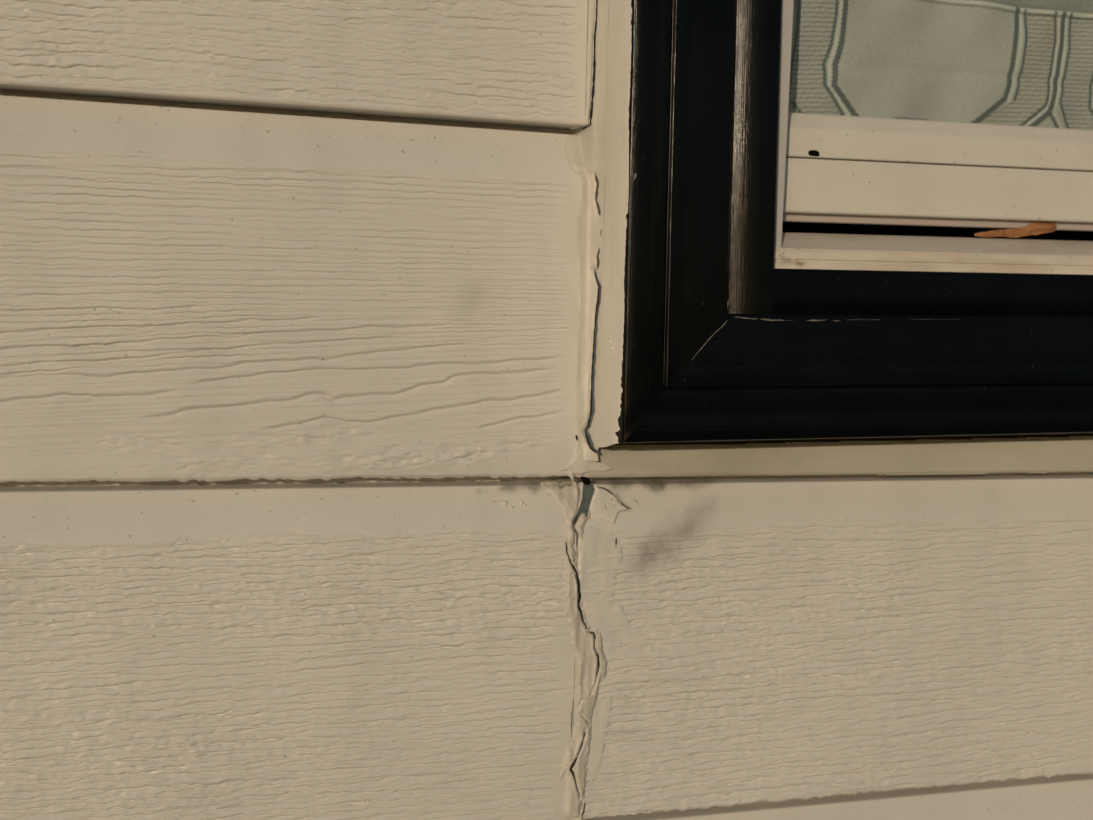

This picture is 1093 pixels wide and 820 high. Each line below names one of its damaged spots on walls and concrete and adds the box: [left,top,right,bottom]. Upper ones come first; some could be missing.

crack [584,173,602,455]
crack [565,524,600,676]
crack [570,697,589,819]